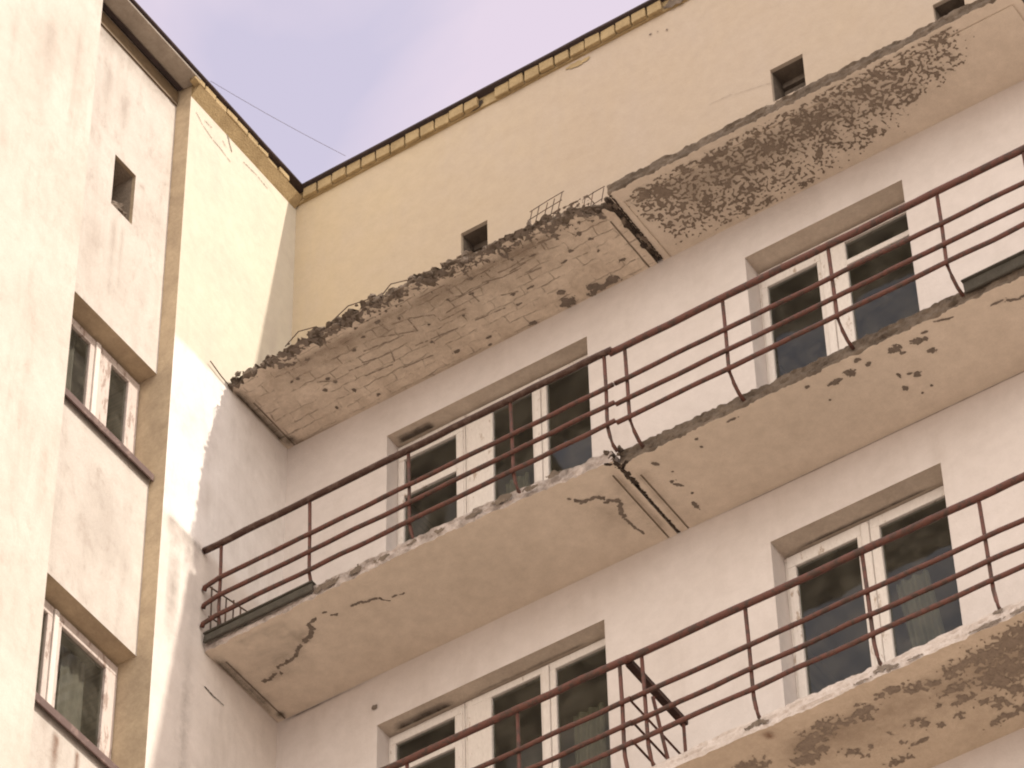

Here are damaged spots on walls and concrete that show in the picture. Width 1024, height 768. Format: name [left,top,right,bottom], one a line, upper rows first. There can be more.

peeling [626,27,974,245]
spalling [210,186,607,389]
spalling [557,275,623,308]
spalling [888,317,953,355]
spalling [827,358,871,401]
spalling [896,371,934,394]
spalling [465,470,560,519]
crack [567,460,681,535]
spalling [313,564,362,593]
crack [261,592,405,683]
peeling [788,606,1024,768]
peeling [731,755,772,768]